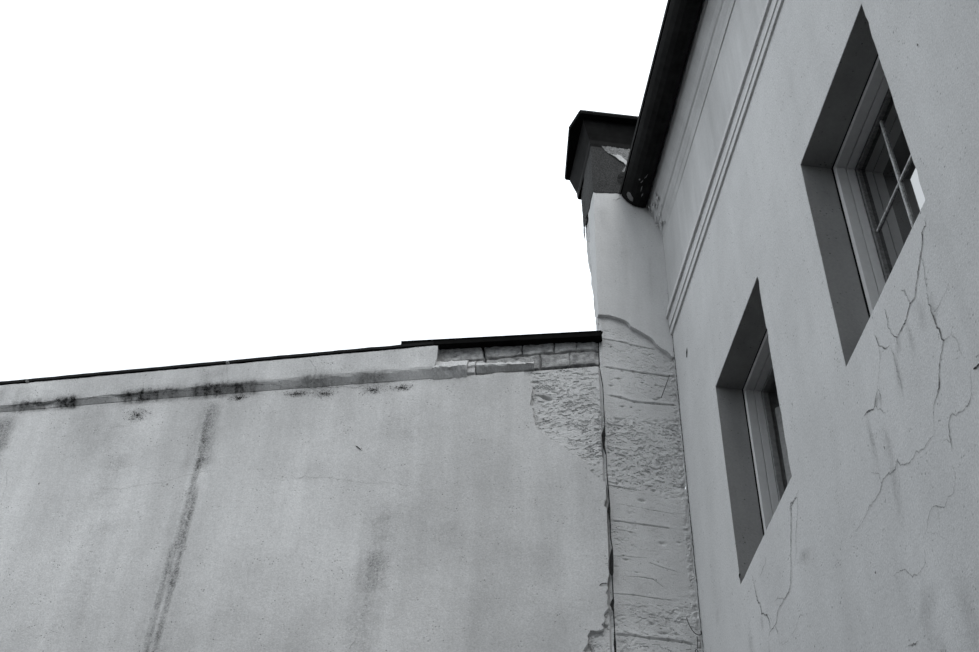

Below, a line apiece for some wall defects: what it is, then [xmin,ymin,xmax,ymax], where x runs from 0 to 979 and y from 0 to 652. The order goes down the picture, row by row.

spalling [524,317,702,652]
crack [876,222,970,446]